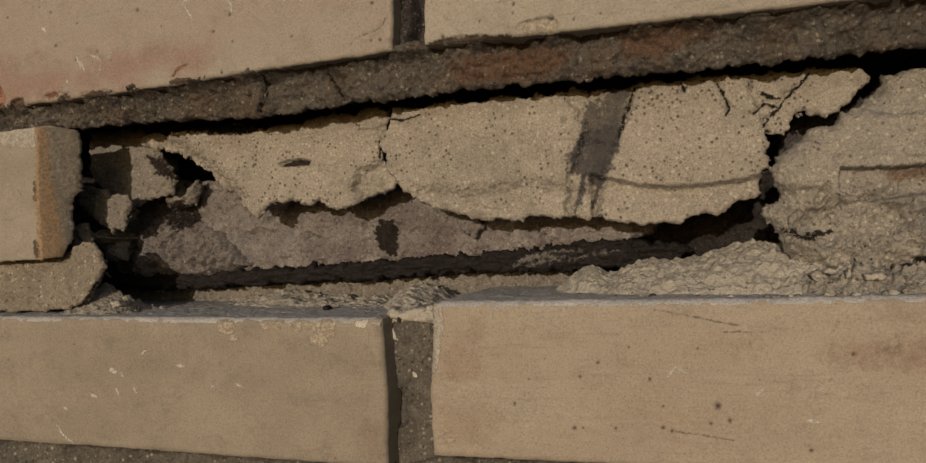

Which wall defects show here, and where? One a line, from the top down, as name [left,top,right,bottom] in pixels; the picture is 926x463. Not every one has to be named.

crack [187,74,282,136]
crack [390,114,420,122]
spalling [112,64,926,302]
leakage [568,86,635,212]
crack [680,74,730,117]
crack [752,69,901,157]